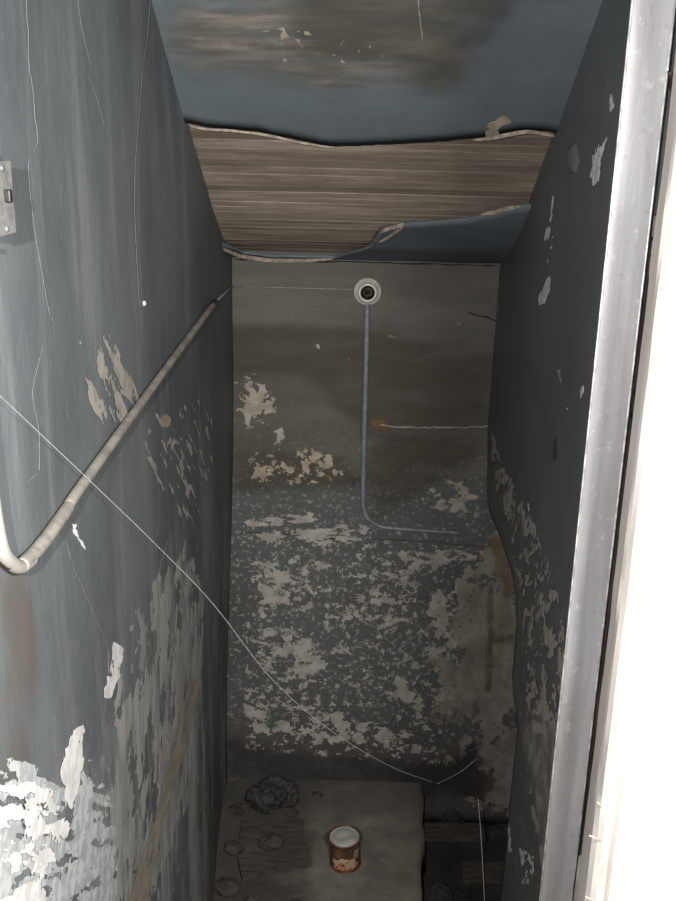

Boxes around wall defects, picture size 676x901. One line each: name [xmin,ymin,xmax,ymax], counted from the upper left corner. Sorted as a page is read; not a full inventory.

leakage [181,0,500,84]
flaking render [188,115,554,263]
peeling [590,138,607,186]
peeling [538,259,550,305]
peeling [234,373,343,486]
flaking render [242,433,565,884]
peeling [0,540,204,901]